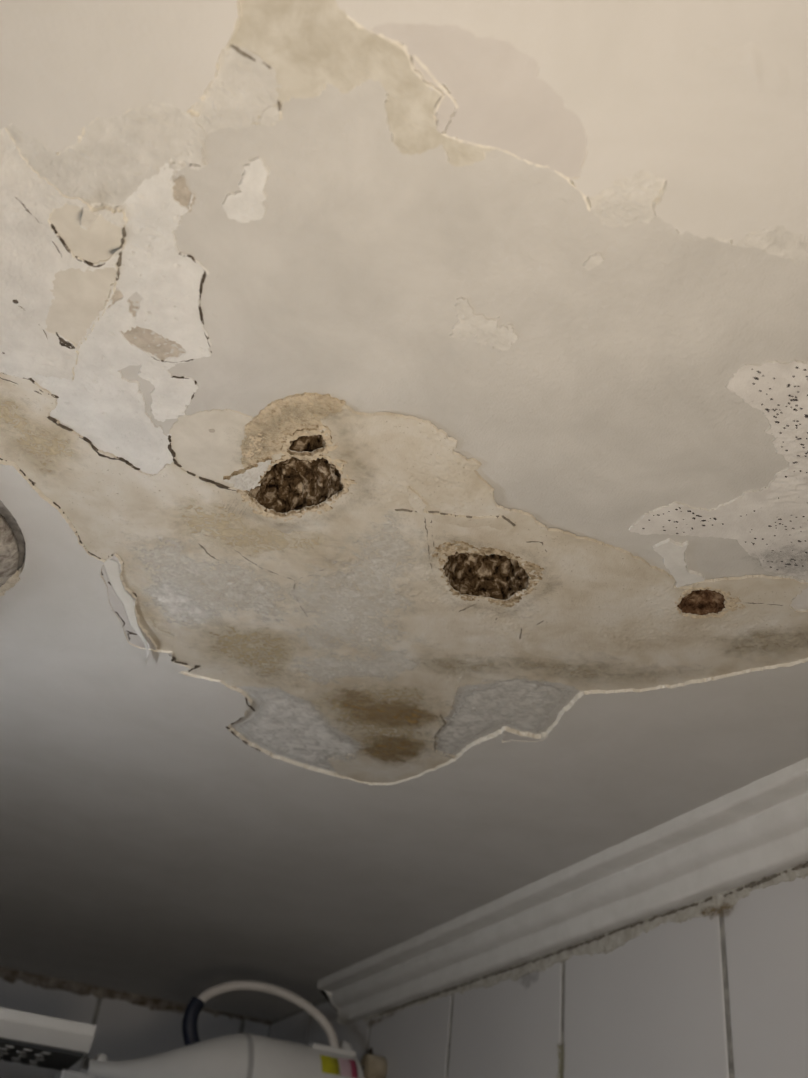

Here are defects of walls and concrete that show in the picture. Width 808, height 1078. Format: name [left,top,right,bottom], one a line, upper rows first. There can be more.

peeling [0,0,808,783]
damp [629,359,808,611]
damp [146,545,288,676]
damp [244,688,432,767]
damp [438,680,563,753]